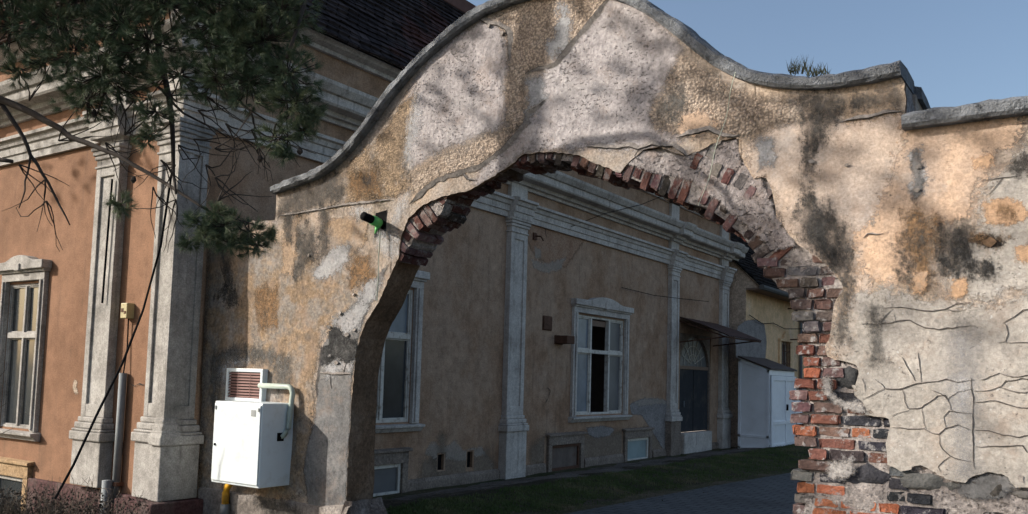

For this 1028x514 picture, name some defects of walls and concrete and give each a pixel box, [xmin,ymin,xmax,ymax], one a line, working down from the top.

crack [587,125,740,161]
water stain [1009,153,1028,176]
water stain [792,82,902,345]
peeling [198,0,1028,506]
water stain [935,218,994,280]
crack [861,302,970,330]
crack [863,358,1028,470]